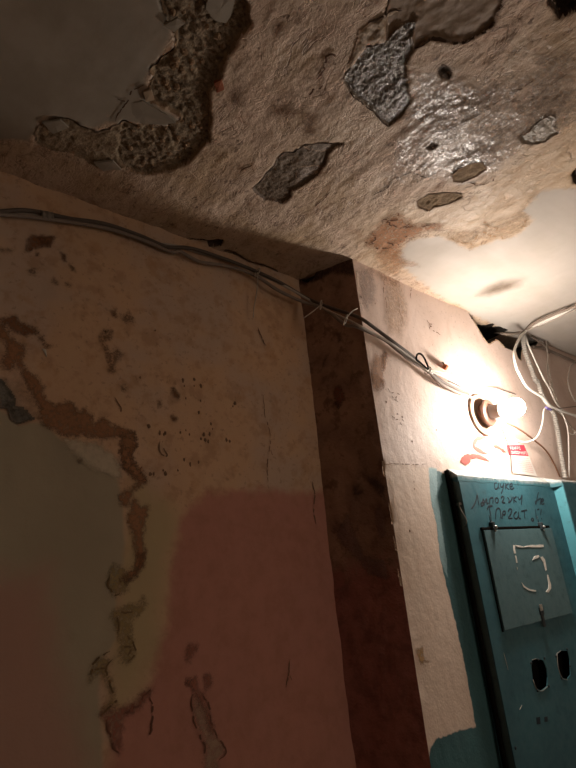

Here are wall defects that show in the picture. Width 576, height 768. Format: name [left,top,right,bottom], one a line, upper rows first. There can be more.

flaking render [34,0,251,176]
flaking render [343,0,503,127]
damp [391,59,576,180]
flaking render [519,116,560,146]
flaking render [253,143,344,204]
flaking render [417,193,463,212]
flaking render [452,163,487,183]
flaking render [0,379,35,424]
peeling [89,598,146,716]